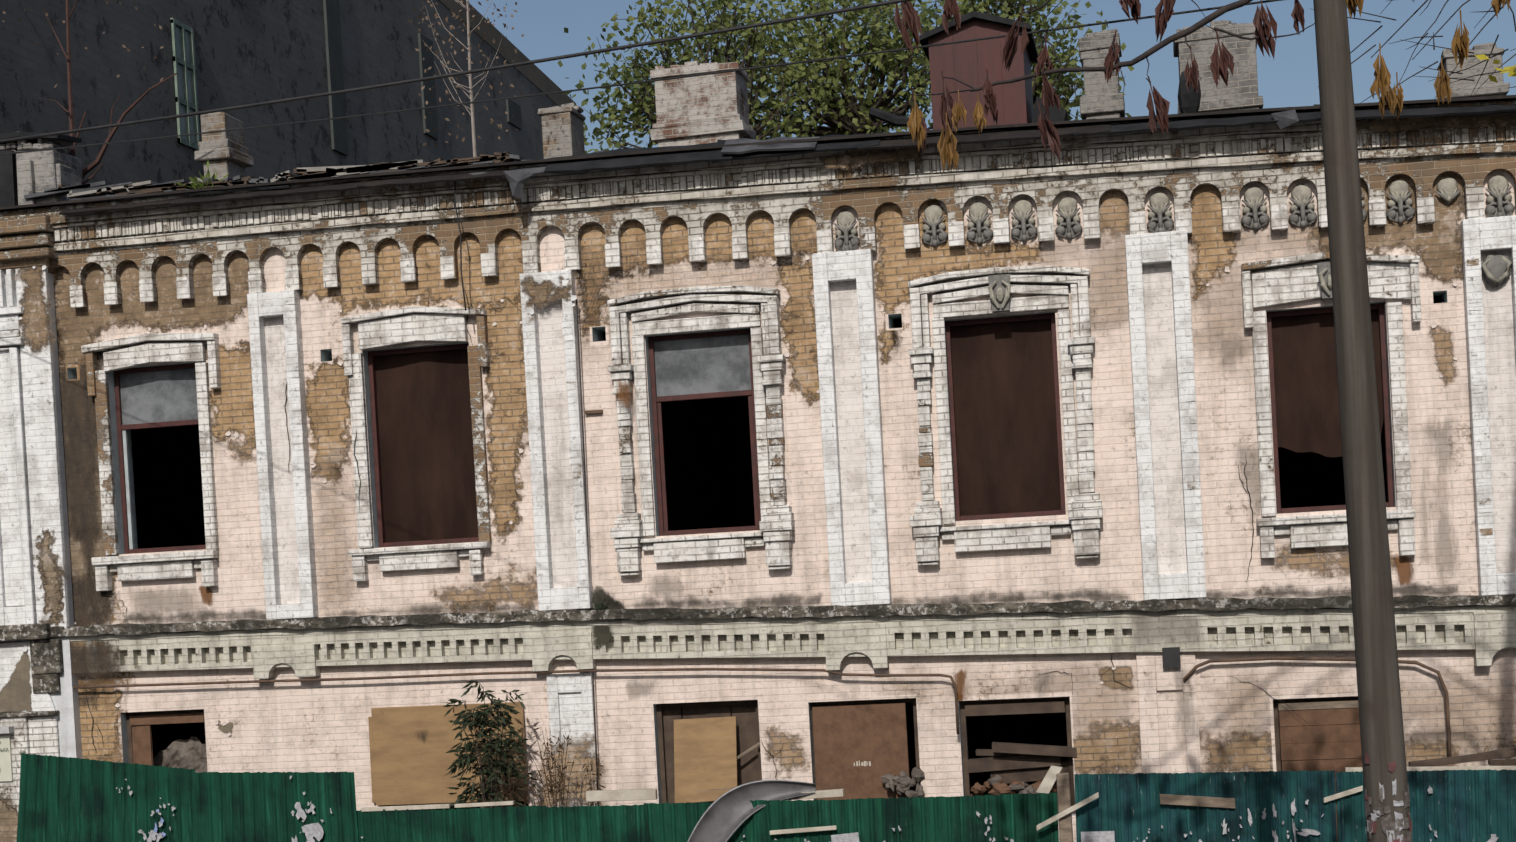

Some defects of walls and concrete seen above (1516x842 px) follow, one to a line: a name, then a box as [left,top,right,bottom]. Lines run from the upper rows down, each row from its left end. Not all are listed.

peeling [13,251,256,461]
peeling [299,209,834,541]
flaking render [1431,322,1458,385]
peeling [32,447,116,626]
leakage [60,351,120,704]
peeling [1275,544,1350,577]
flaking render [0,646,32,713]
peeling [766,727,810,772]
peeling [1073,721,1141,774]
peeling [0,788,18,842]